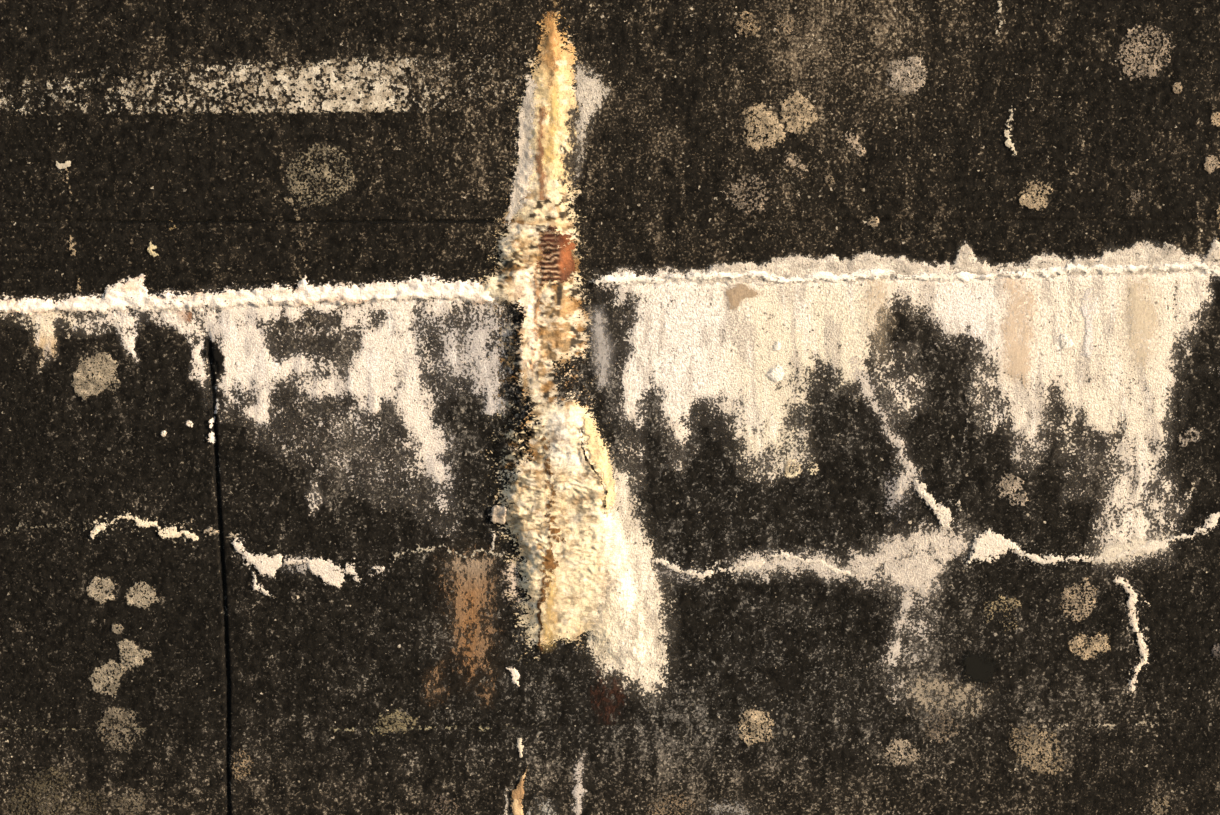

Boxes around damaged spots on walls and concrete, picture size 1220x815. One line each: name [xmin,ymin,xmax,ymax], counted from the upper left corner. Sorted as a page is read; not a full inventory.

crack [56,161,72,193]
crack [66,235,81,295]
crack [3,331,509,815]
damp [0,0,675,700]
damp [589,239,1220,552]
crack [638,356,1220,729]